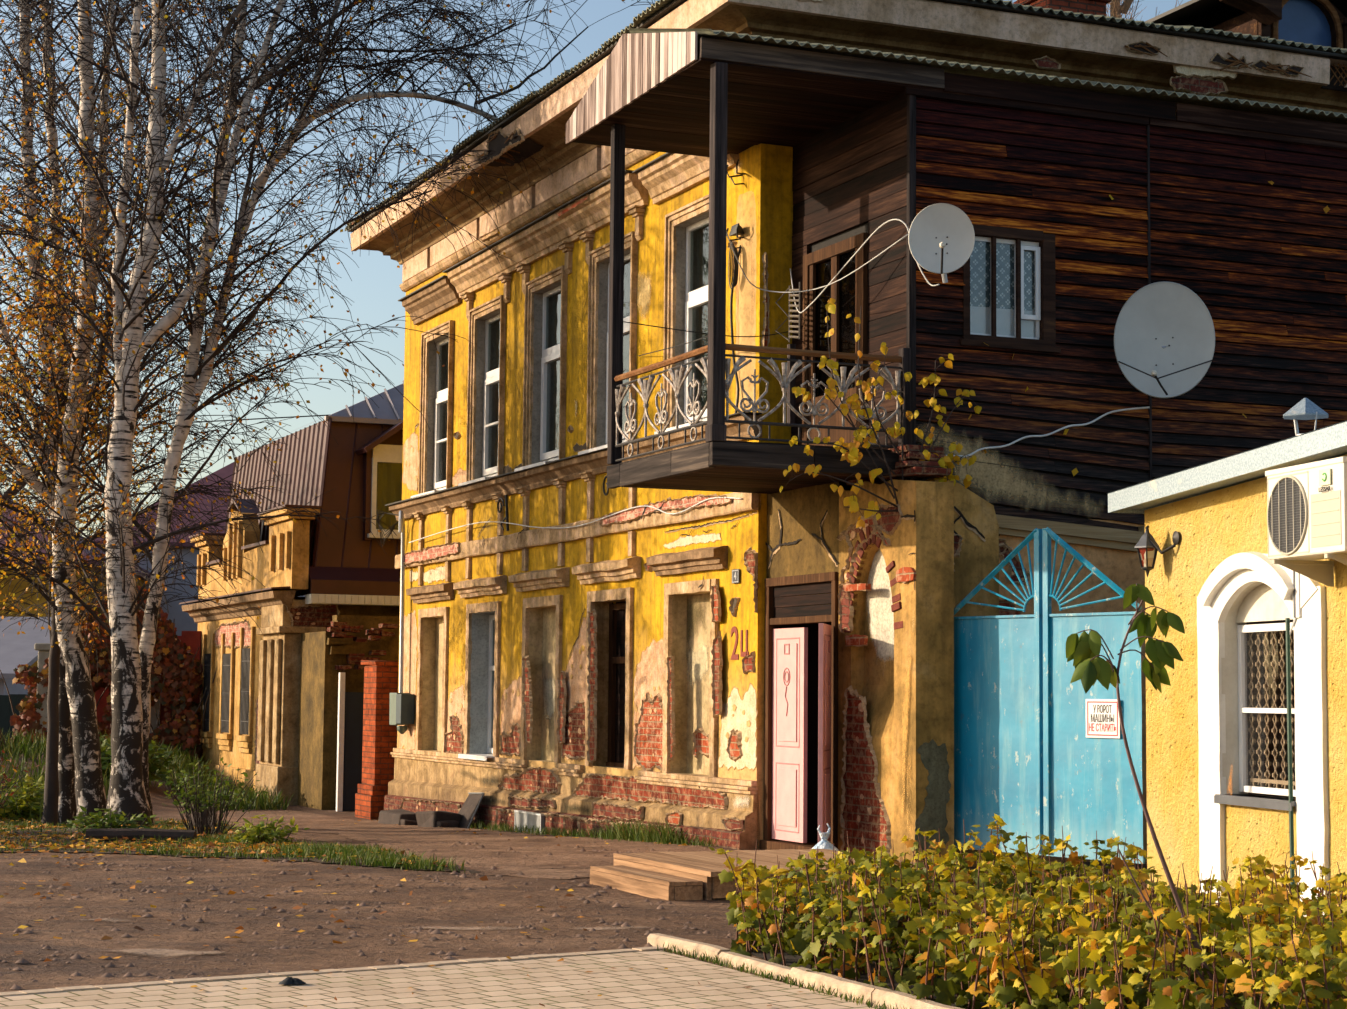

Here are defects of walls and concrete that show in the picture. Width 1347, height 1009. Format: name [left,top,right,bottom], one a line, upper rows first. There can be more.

flaking render [1170,65,1237,96]
flaking render [599,493,732,527]
crack [641,501,838,569]
flaking render [837,503,903,647]
flaking render [896,567,917,584]
flaking render [495,609,744,838]
peeling [692,547,758,771]
flaking render [840,685,892,856]